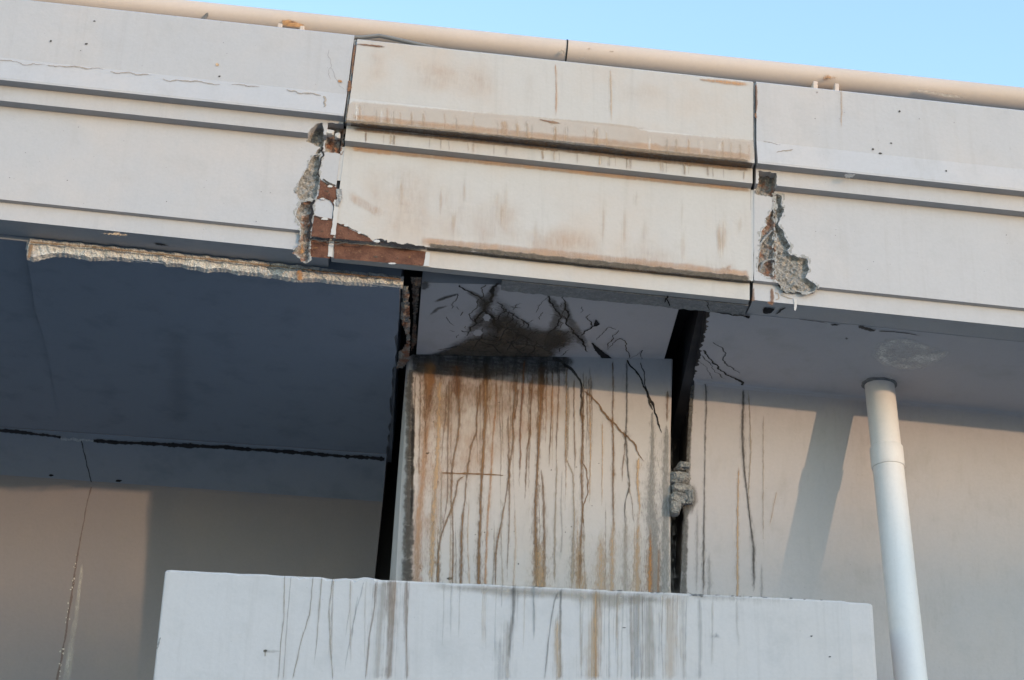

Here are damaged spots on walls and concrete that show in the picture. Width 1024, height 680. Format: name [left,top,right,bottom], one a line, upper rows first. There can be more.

crack [0,60,258,87]
spalling [26,128,430,369]
rust [351,121,752,170]
spalling [756,193,819,295]
rust [414,365,460,582]
water stain [402,287,689,617]
crack [440,283,662,578]
crack [703,342,755,578]
water stain [293,579,333,678]